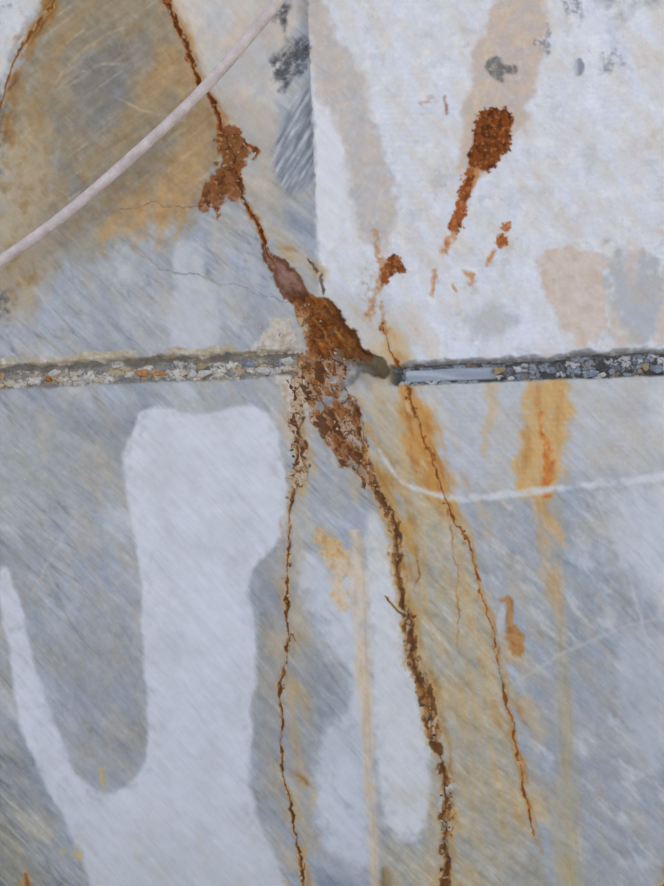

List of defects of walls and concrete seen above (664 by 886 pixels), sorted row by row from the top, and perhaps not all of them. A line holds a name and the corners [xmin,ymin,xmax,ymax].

crack [0,0,65,145]
leakage [0,0,192,254]
leakage [0,99,221,337]
crack [142,256,289,304]
crack [158,0,332,296]
rust [357,226,408,335]
rust [428,105,515,298]
crack [274,415,321,886]
crack [344,322,664,886]